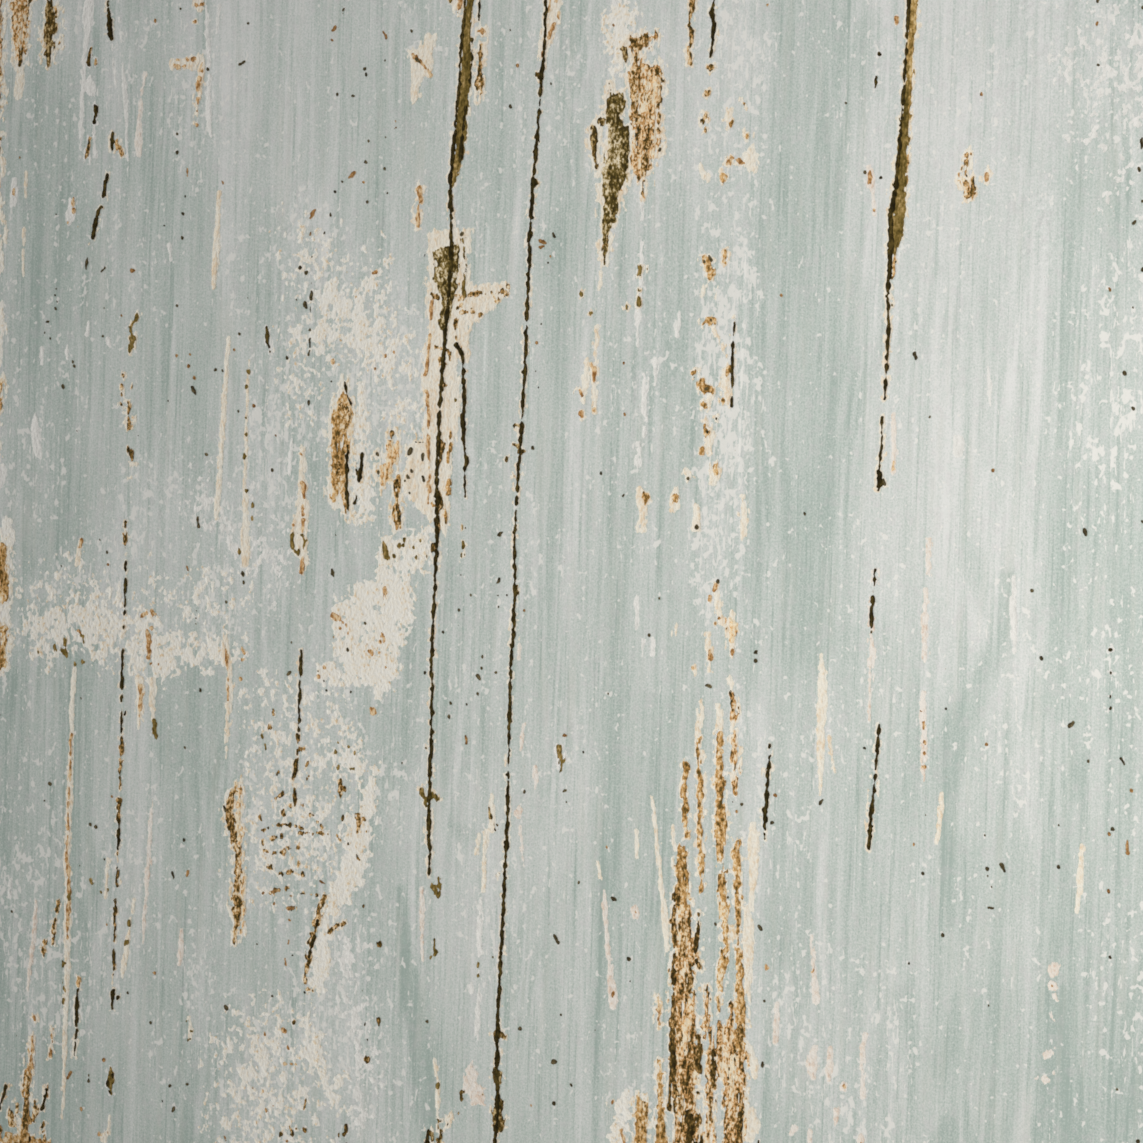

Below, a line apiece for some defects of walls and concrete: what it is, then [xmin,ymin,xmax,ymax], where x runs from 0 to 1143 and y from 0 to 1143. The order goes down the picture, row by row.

peeling [169,52,209,127]
peeling [0,180,516,1143]
peeling [407,29,437,104]
crack [416,0,483,879]
peeling [447,0,463,18]
peeling [472,23,490,106]
crack [488,0,549,1143]
peeling [573,0,669,422]
peeling [602,579,766,1143]
crack [872,0,922,493]
peeling [1047,962,1061,1022]
peeling [1045,0,1143,225]